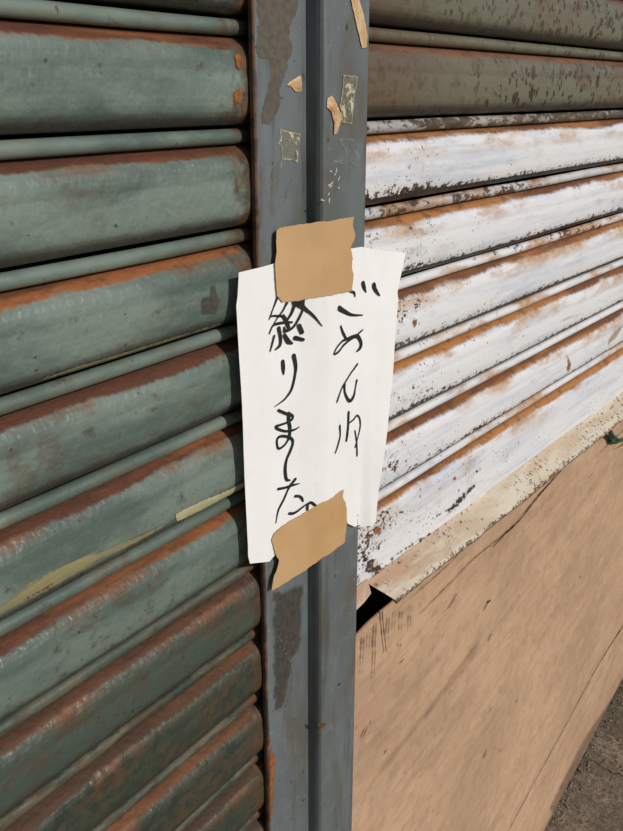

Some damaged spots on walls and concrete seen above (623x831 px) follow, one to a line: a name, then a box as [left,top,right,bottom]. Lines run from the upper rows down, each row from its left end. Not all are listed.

peeling [255,0,298,125]